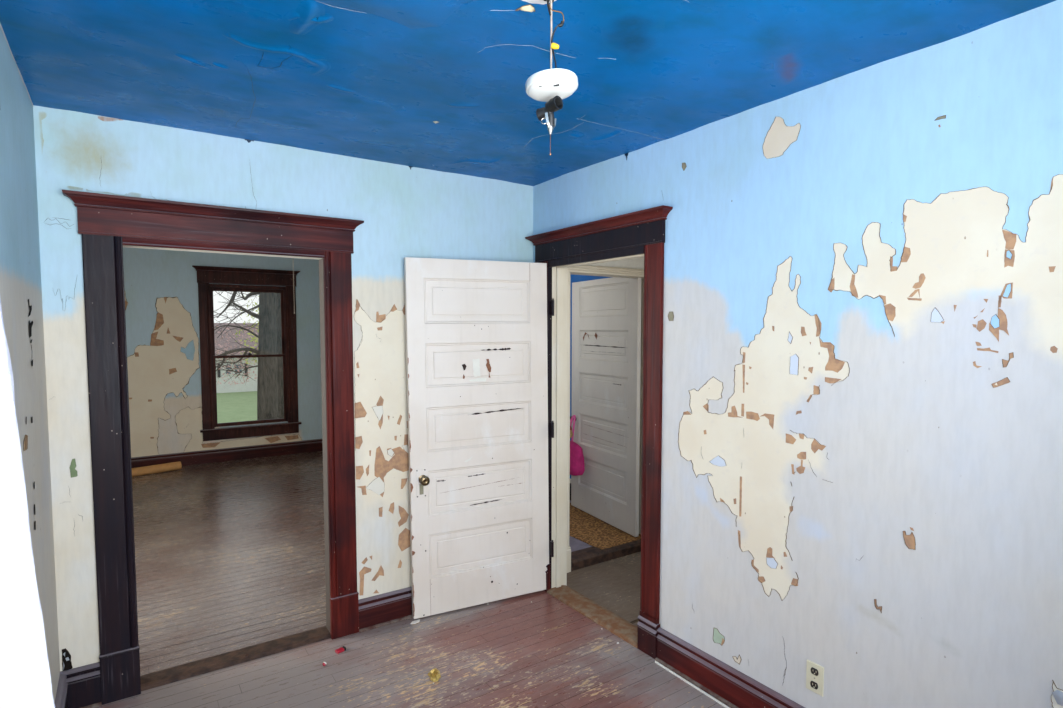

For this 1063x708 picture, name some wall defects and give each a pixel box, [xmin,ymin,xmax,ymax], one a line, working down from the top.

peeling [763,117,801,159]
peeling [127,297,302,458]
peeling [354,299,426,616]
peeling [678,256,850,600]
peeling [828,174,1063,388]
peeling [1051,680,1063,708]